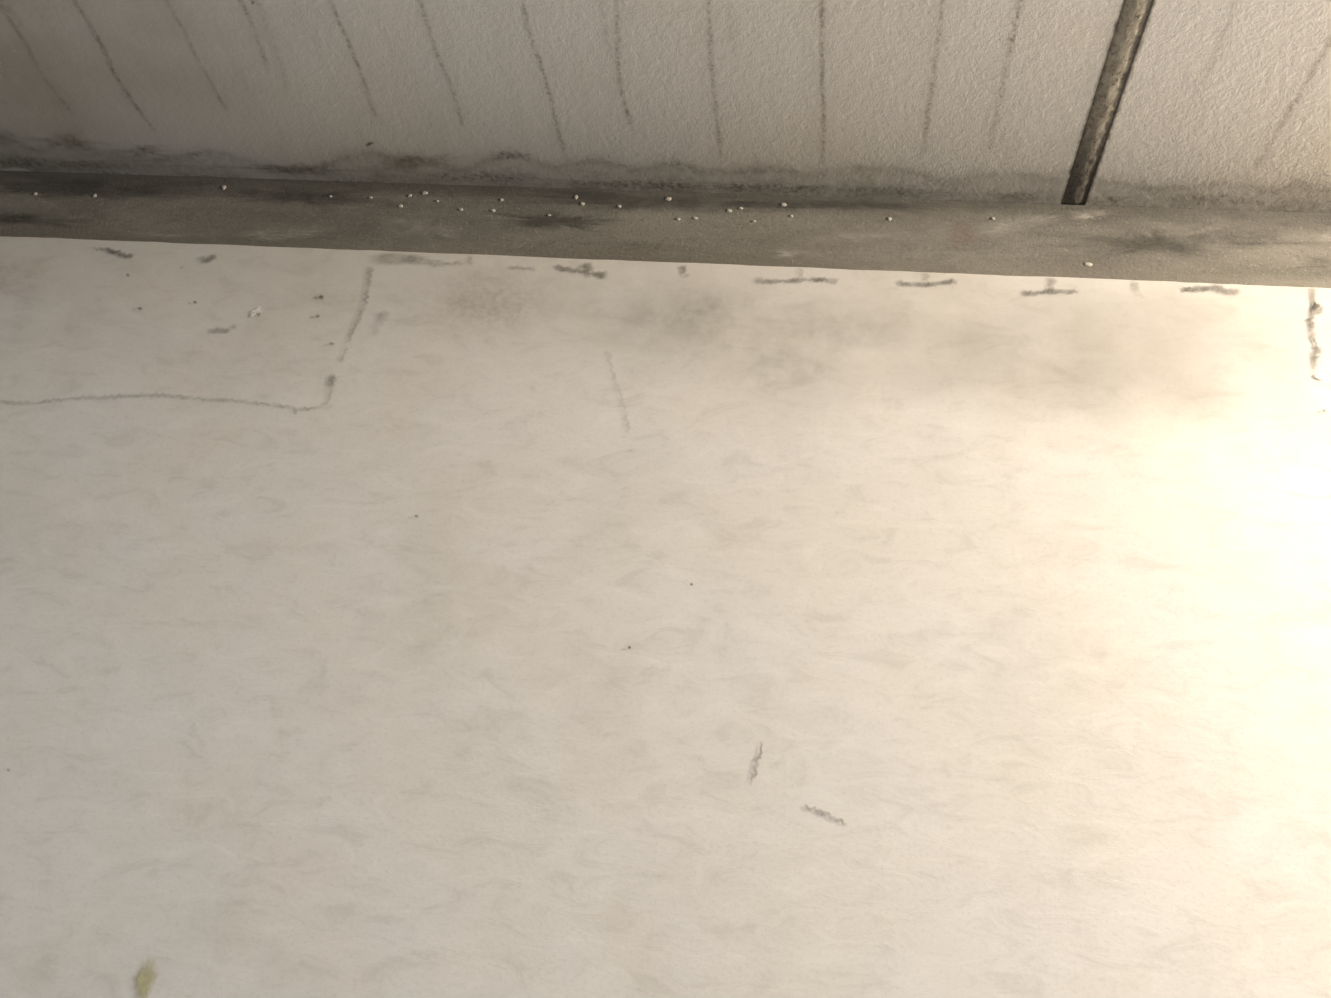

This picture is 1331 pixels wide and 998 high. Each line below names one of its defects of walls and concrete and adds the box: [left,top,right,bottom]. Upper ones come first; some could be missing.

crack [1308,292,1327,380]